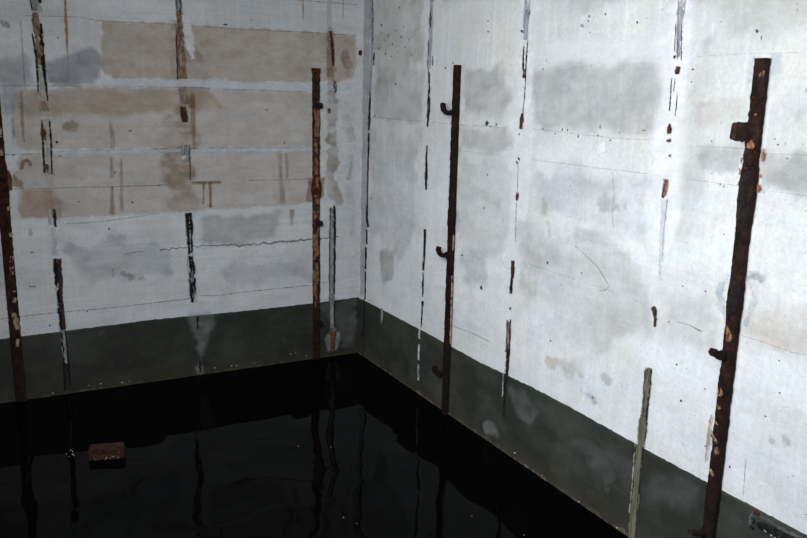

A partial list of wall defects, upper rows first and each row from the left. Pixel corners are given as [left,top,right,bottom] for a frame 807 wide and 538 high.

corrosion [32,12,41,65]
crack [11,0,67,101]
corrosion [176,11,187,79]
crack [91,0,344,88]
crack [32,120,108,189]
crack [130,146,298,183]
crack [299,0,375,356]
crack [0,206,338,391]
damp [0,338,16,403]
damp [21,297,708,538]
damp [715,490,807,538]